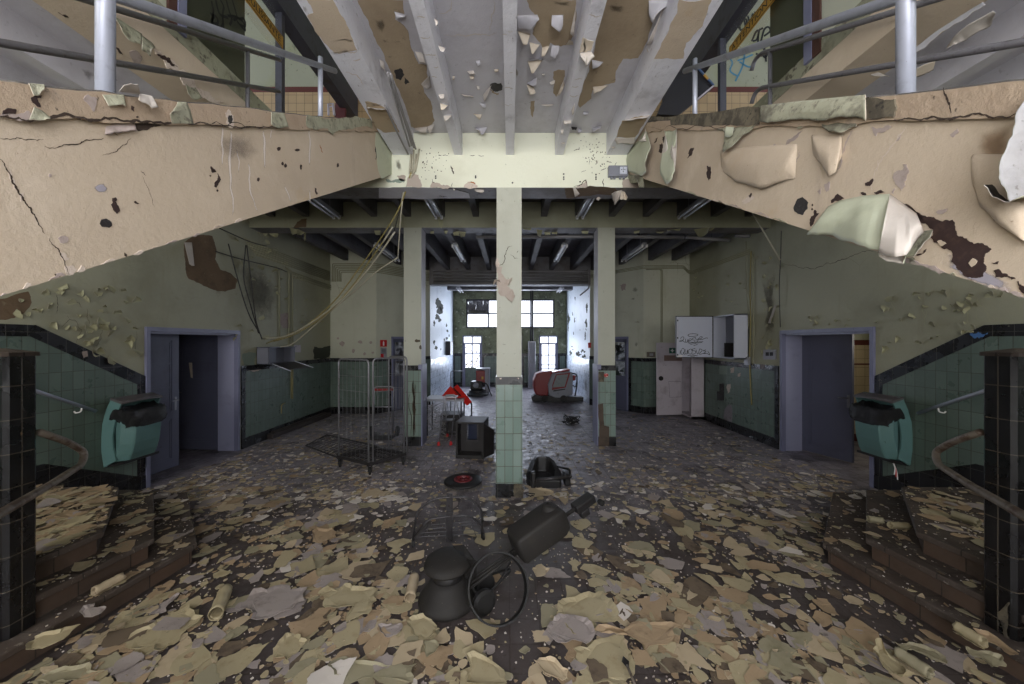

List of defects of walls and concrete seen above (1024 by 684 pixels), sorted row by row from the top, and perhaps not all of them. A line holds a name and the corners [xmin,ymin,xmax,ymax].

spalling [307,0,357,53]
spalling [357,0,452,134]
peeling [461,60,503,135]
spalling [516,0,711,144]
peeling [565,95,901,205]
peeling [0,265,143,365]
spalling [100,197,120,228]
crack [0,112,276,344]
spalling [103,218,243,292]
spalling [493,258,515,302]
peeling [793,179,1024,335]